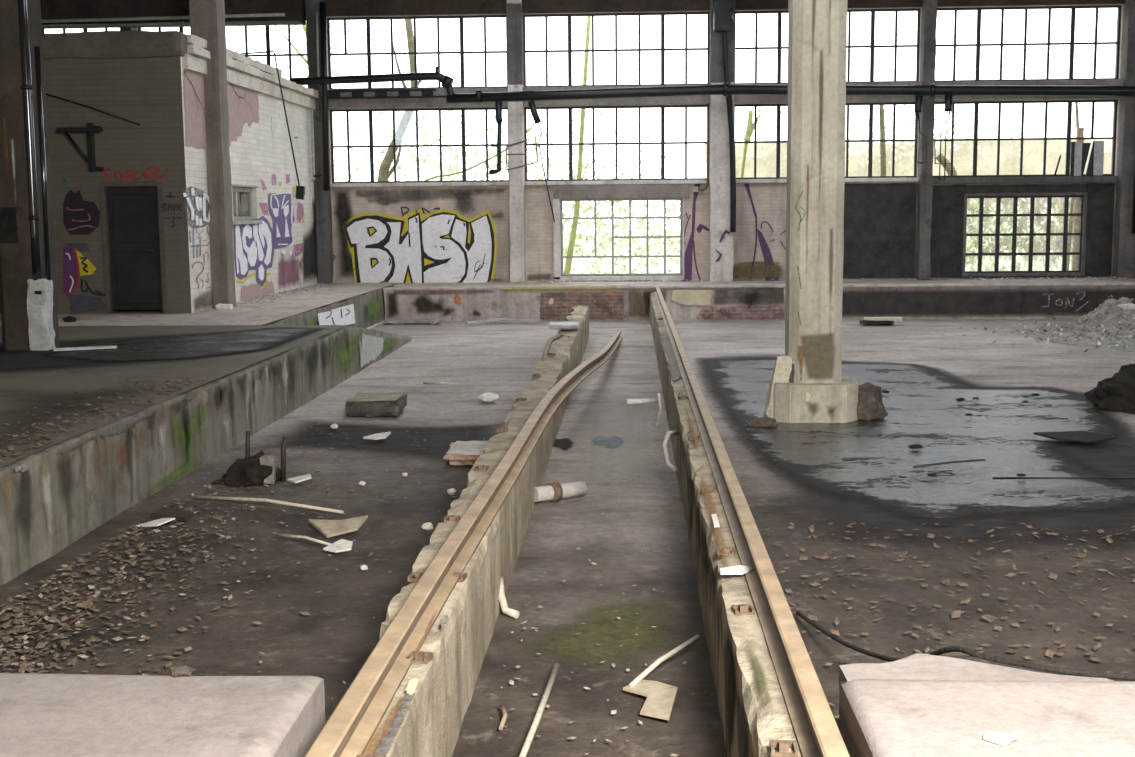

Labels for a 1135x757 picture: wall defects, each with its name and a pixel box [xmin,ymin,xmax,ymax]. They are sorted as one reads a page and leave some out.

peeling [184,69,207,149]
peeling [227,83,259,146]
damp [0,333,212,371]
damp [24,391,120,424]
damp [126,331,363,482]
damp [2,435,110,535]
damp [803,483,1135,544]
damp [1058,431,1135,487]